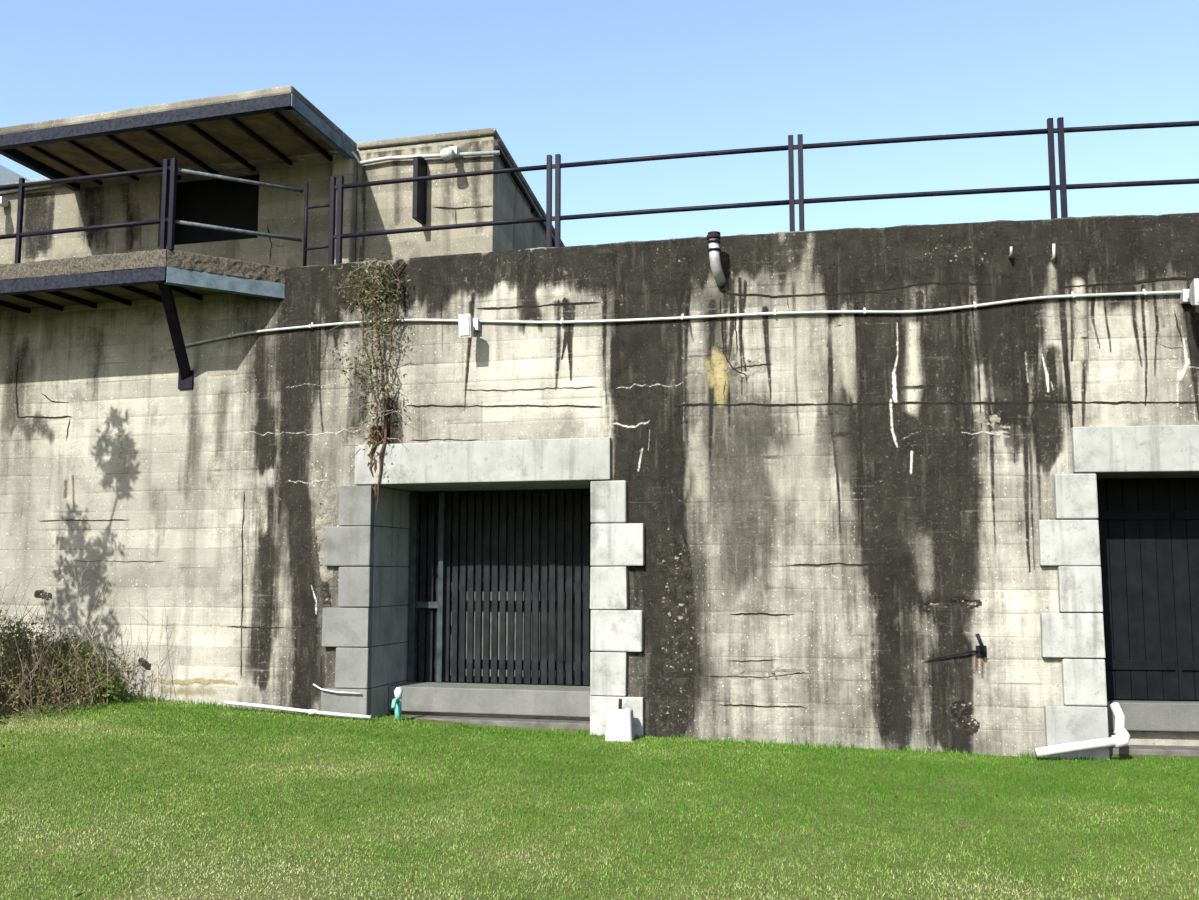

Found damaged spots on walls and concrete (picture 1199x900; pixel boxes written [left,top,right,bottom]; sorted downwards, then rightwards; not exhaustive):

water stain [6,344,54,441]
water stain [243,266,367,714]
water stain [386,397,403,444]
water stain [517,251,575,389]
corrosion [705,349,728,408]
water stain [603,218,1199,754]